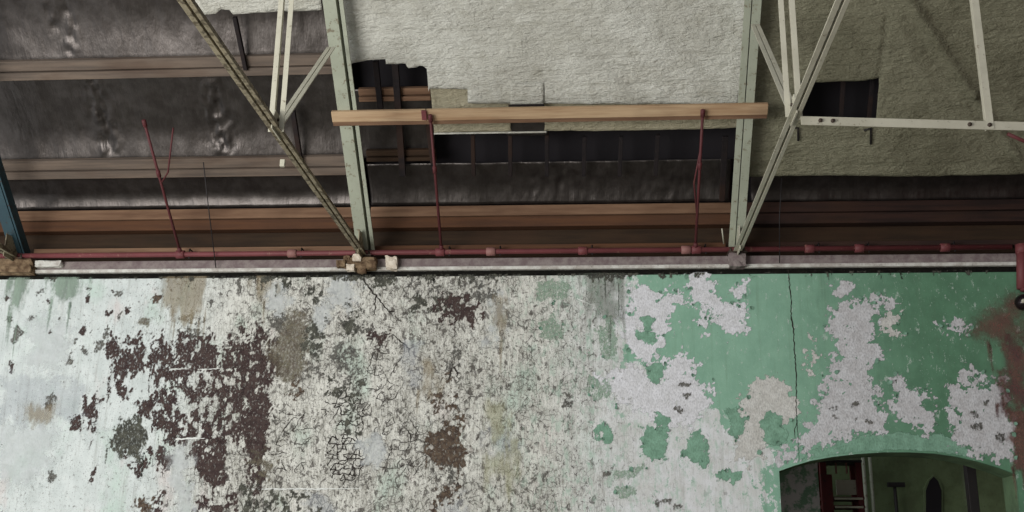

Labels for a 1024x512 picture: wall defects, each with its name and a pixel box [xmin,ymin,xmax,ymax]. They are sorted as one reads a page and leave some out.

crack [271,279,428,484]
spalling [419,392,473,512]
spalling [431,291,485,337]
peeling [588,272,754,439]
crack [788,270,799,455]
peeling [718,280,1018,475]
rust [973,299,1024,488]